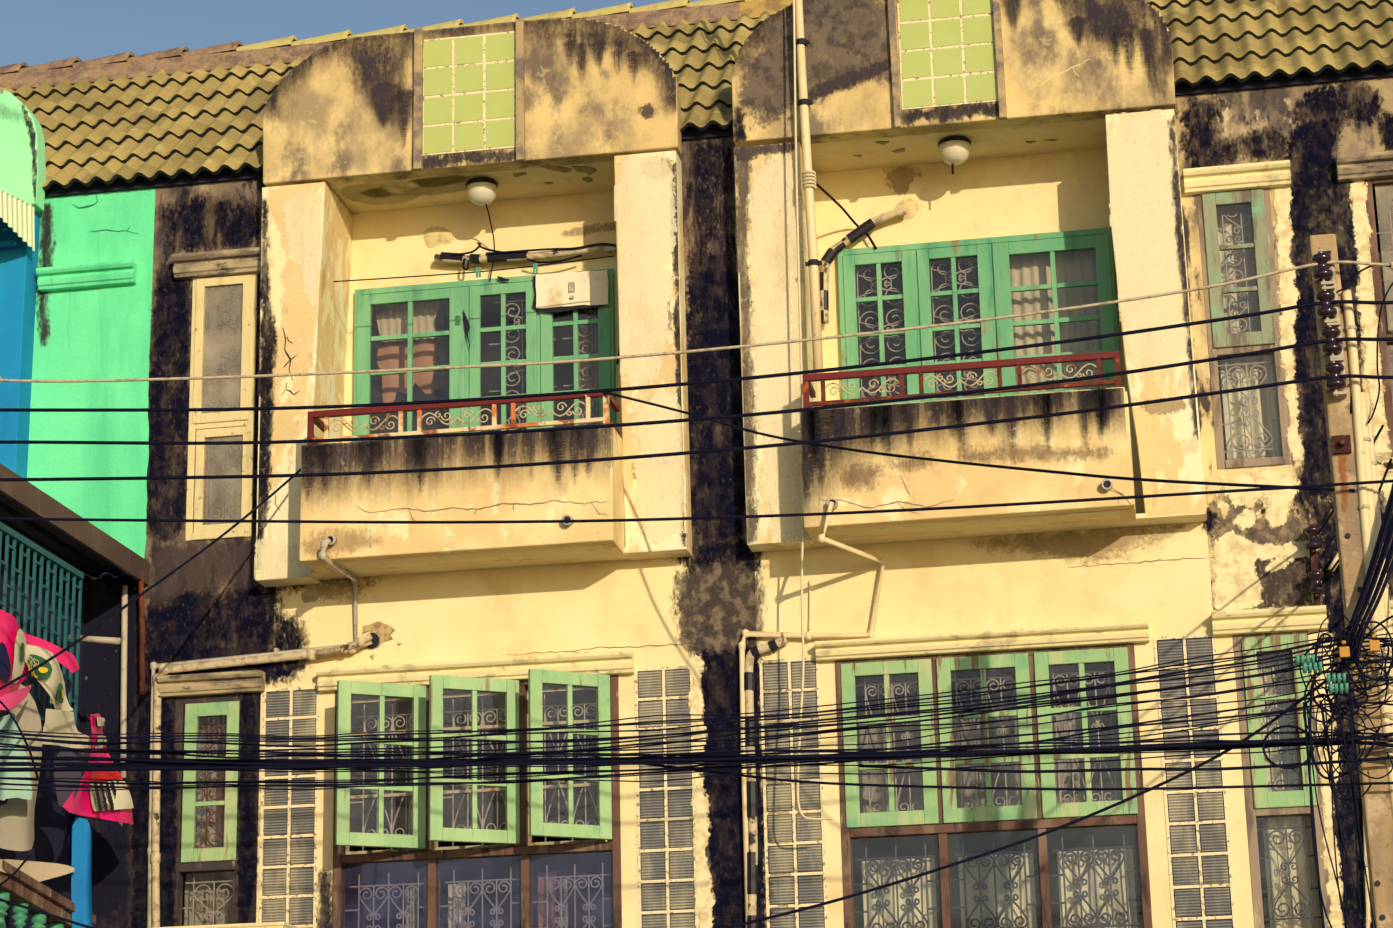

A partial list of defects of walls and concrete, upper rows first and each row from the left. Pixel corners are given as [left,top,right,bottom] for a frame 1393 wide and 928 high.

damp [263,17,676,137]
damp [901,102,999,126]
damp [887,168,921,194]
damp [128,192,370,928]
damp [301,423,613,493]
damp [670,0,892,928]
damp [800,387,1124,506]
damp [1168,81,1393,928]